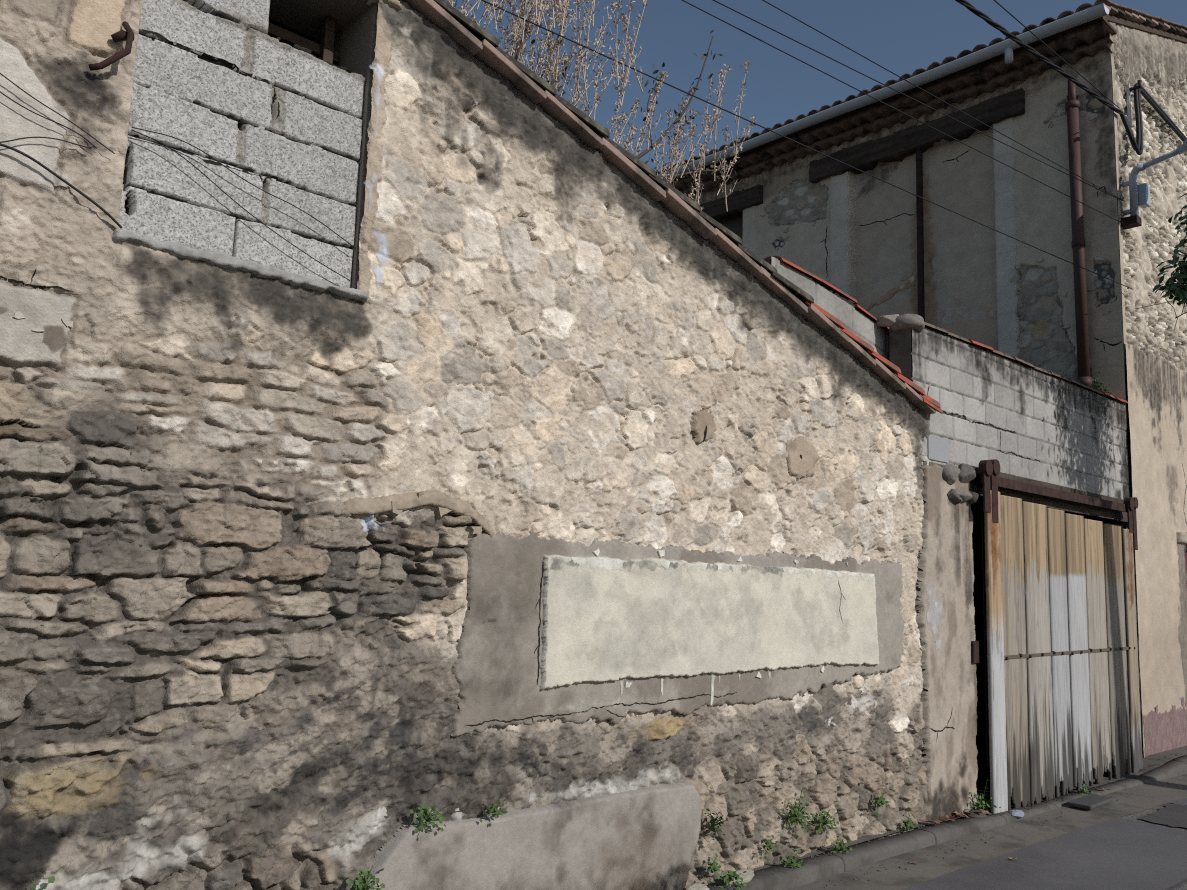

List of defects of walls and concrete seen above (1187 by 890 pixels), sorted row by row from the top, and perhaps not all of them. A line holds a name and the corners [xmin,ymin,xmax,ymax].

crack [859,213,913,226]
crack [0,270,73,292]
peeling [0,307,73,350]
leakage [1134,344,1187,426]
peeling [564,548,624,570]
peeling [657,550,747,572]
peeling [780,559,874,582]
crack [534,562,544,685]
crack [466,692,737,726]